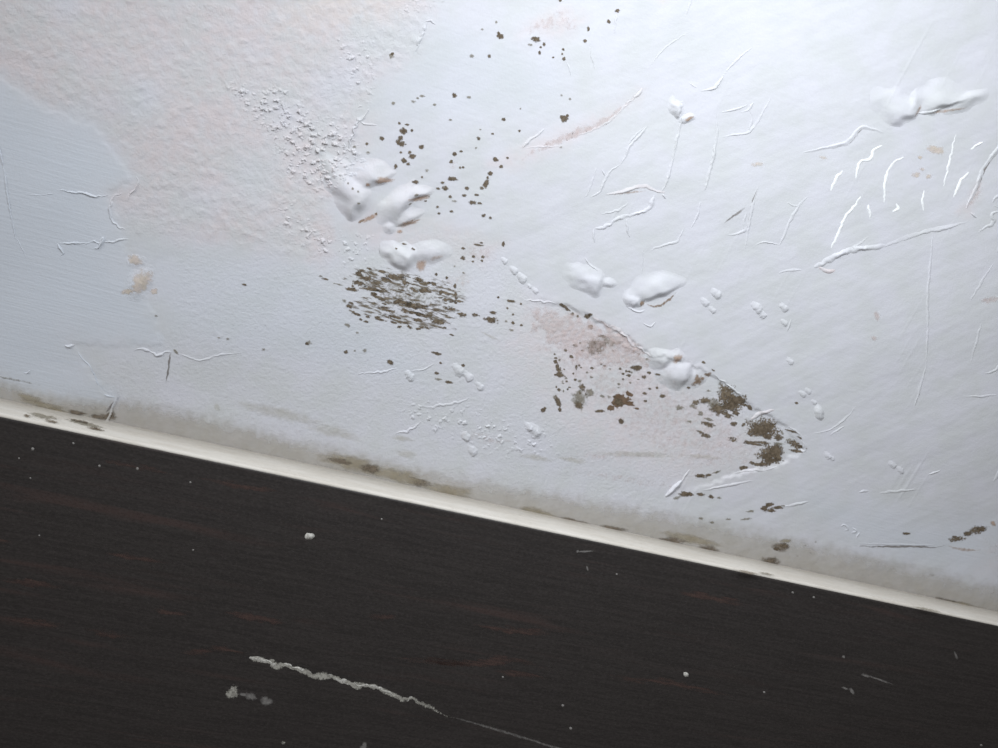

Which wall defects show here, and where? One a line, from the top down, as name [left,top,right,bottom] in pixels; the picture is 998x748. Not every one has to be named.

mould [320,267,523,336]
mould [541,303,665,424]